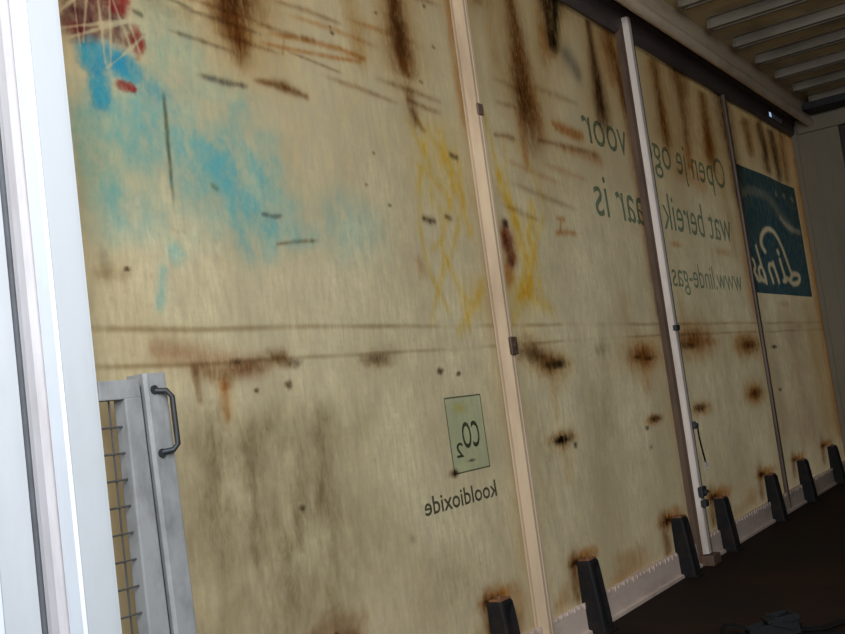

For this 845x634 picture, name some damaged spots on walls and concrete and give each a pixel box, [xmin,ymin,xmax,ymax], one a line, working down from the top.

rust [221,0,246,56]
rust [388,0,411,77]
rust [508,0,535,136]
rust [530,348,564,369]